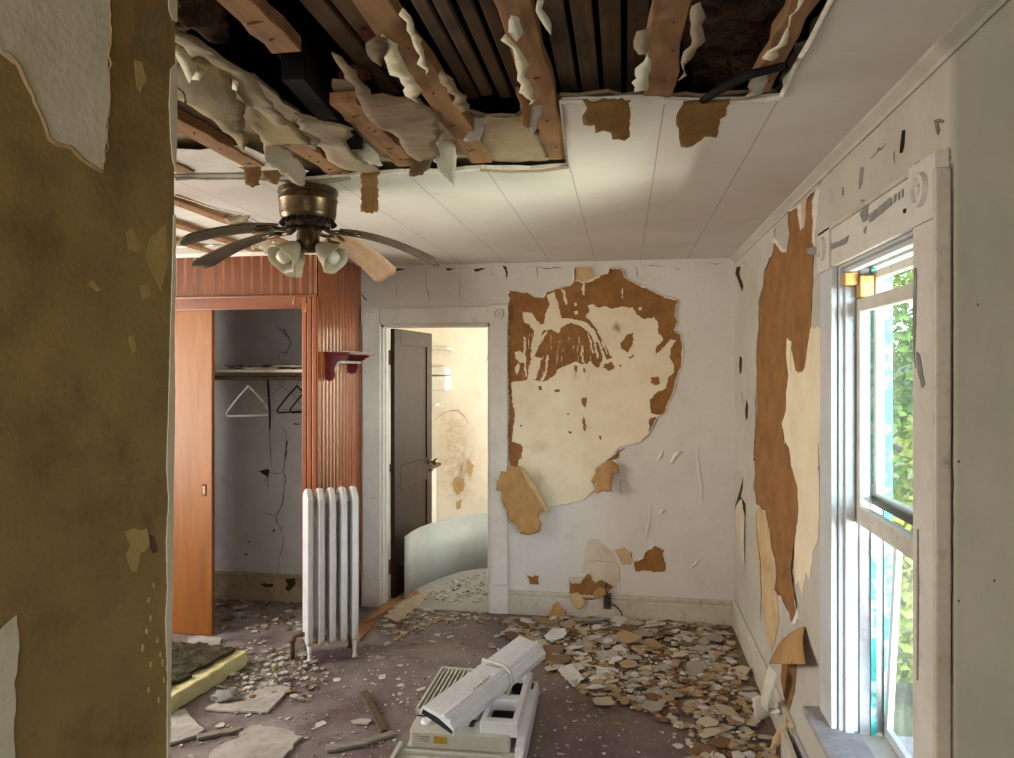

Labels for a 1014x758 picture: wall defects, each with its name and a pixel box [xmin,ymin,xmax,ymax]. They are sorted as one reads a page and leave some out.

spalling [168,0,178,22]
peeling [0,0,112,174]
peeling [169,62,244,175]
peeling [233,145,284,176]
spalling [125,205,256,758]
crack [261,423,299,591]
peeling [496,466,550,535]
peeling [549,574,613,619]
peeling [591,460,619,494]
peeling [631,544,666,572]
flaking render [782,326,820,596]
peeling [0,615,19,758]